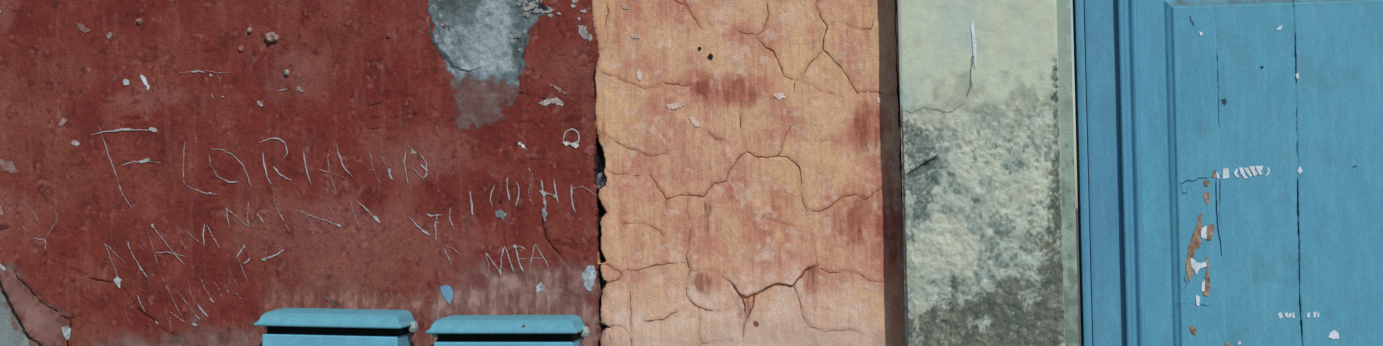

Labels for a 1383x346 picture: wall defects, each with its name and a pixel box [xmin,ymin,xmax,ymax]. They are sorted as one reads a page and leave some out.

spalling [428,0,592,130]
peeling [0,159,18,174]
peeling [0,264,71,346]
crack [542,0,973,346]
water stain [903,64,1065,346]
peeling [1181,166,1270,306]